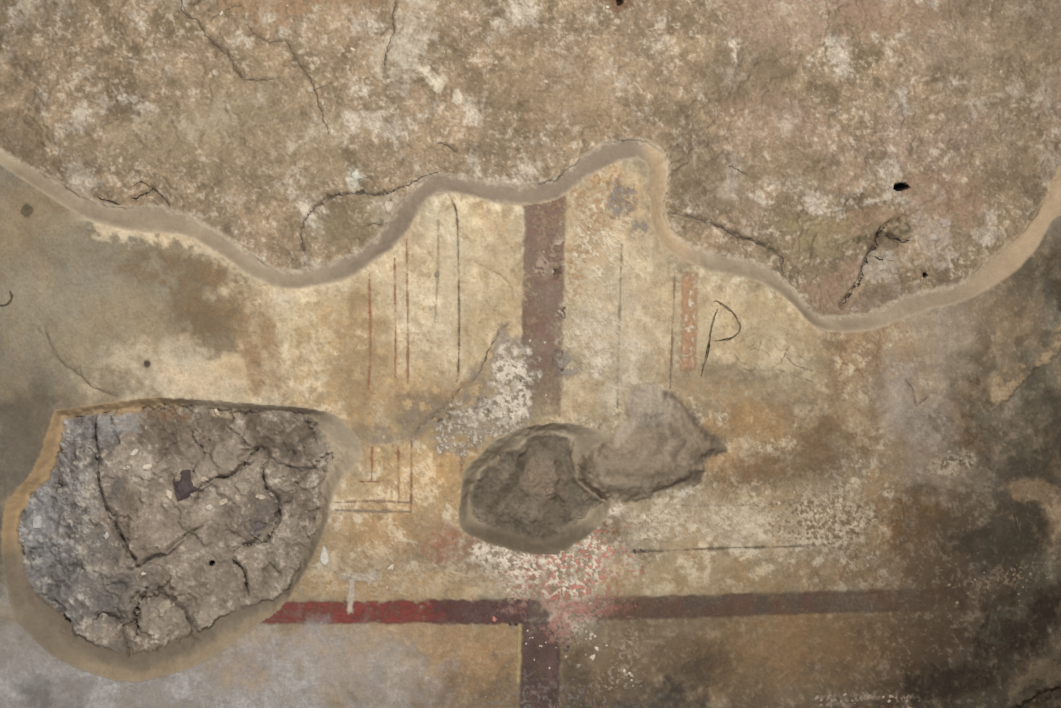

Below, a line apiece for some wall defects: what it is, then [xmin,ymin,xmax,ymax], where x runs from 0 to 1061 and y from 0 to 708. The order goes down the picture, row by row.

crack [180,0,331,135]
crack [98,181,170,208]
crack [841,225,911,306]
flaking render [1,398,362,683]
flaking render [319,329,876,690]